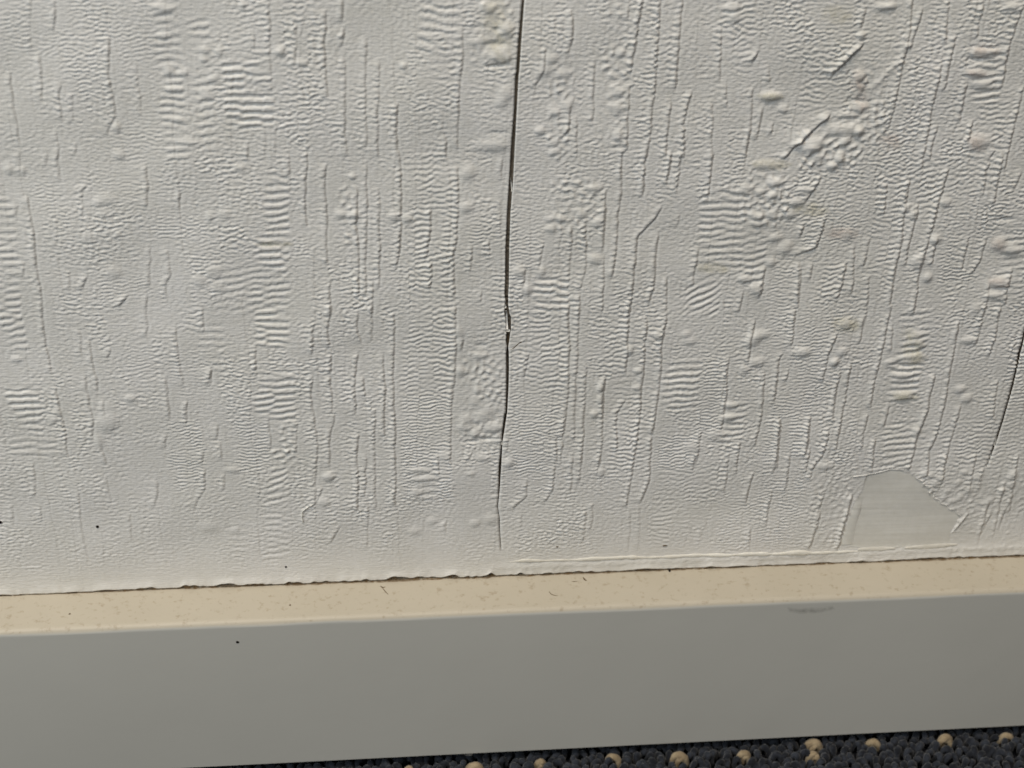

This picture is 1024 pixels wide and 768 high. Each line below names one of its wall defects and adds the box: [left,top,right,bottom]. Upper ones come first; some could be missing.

crack [497,0,524,545]